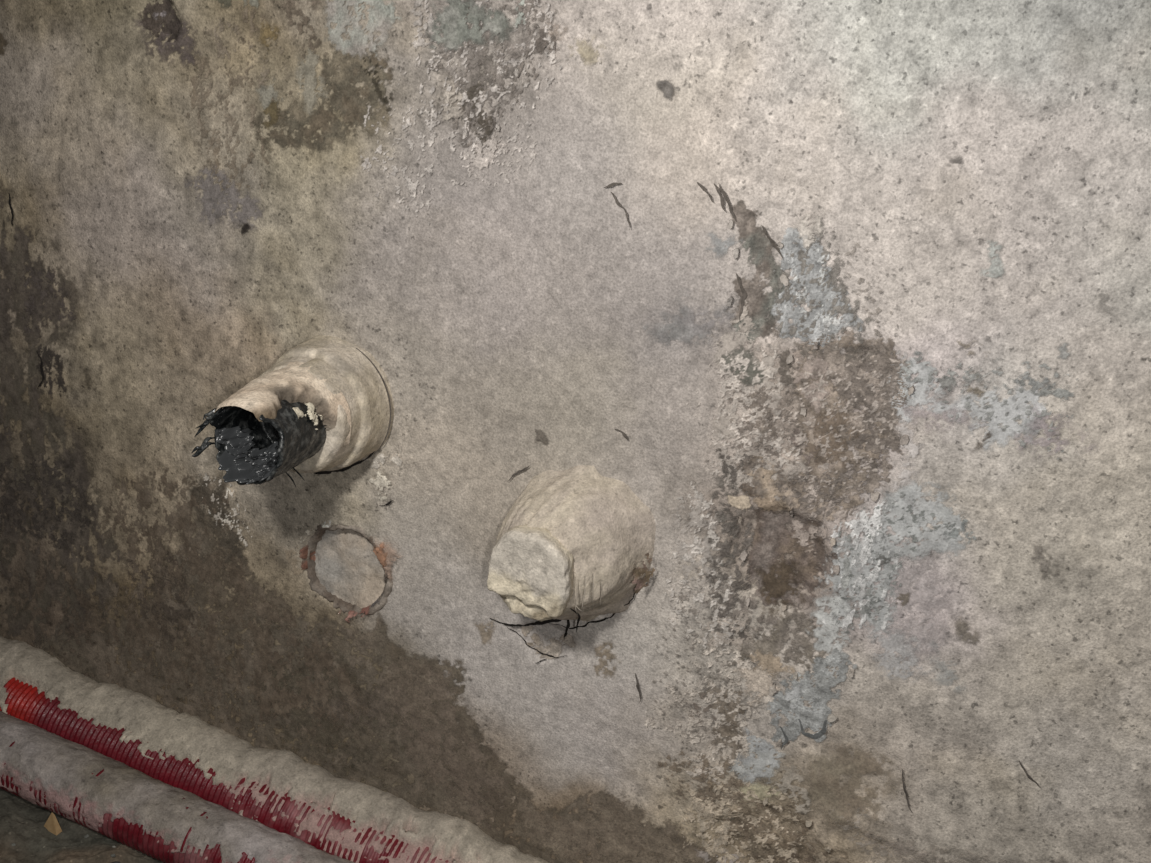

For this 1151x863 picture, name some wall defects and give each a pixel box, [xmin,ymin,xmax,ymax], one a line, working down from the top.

water stain [253,2,393,151]
water stain [0,220,718,863]
water stain [644,330,818,813]
water stain [807,341,1077,665]